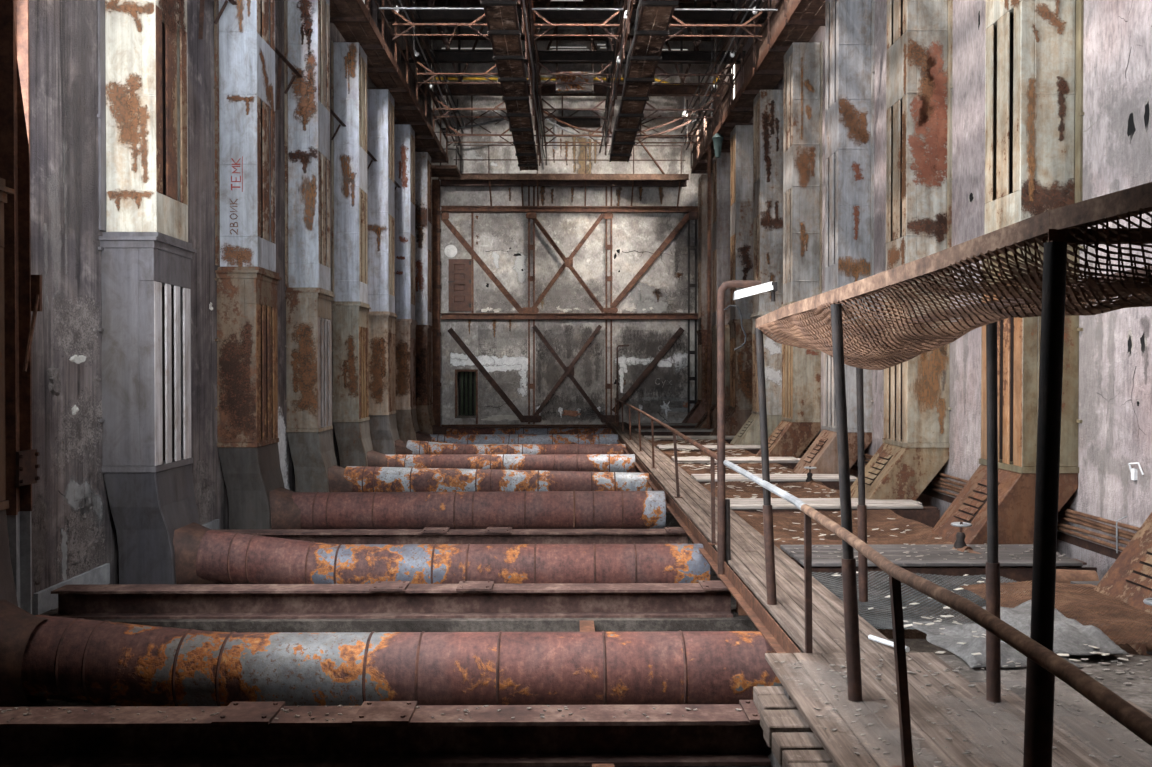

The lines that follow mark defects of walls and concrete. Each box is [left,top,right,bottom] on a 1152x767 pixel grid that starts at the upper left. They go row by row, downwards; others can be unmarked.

rust [105,0,186,35]
rust [1032,0,1066,43]
rust [106,73,154,211]
rust [226,49,274,115]
rust [288,146,318,231]
rust [291,0,318,131]
rust [340,154,357,207]
rust [761,100,779,183]
rust [793,57,816,188]
rust [839,98,870,146]
rust [901,39,948,198]
rust [219,322,256,440]